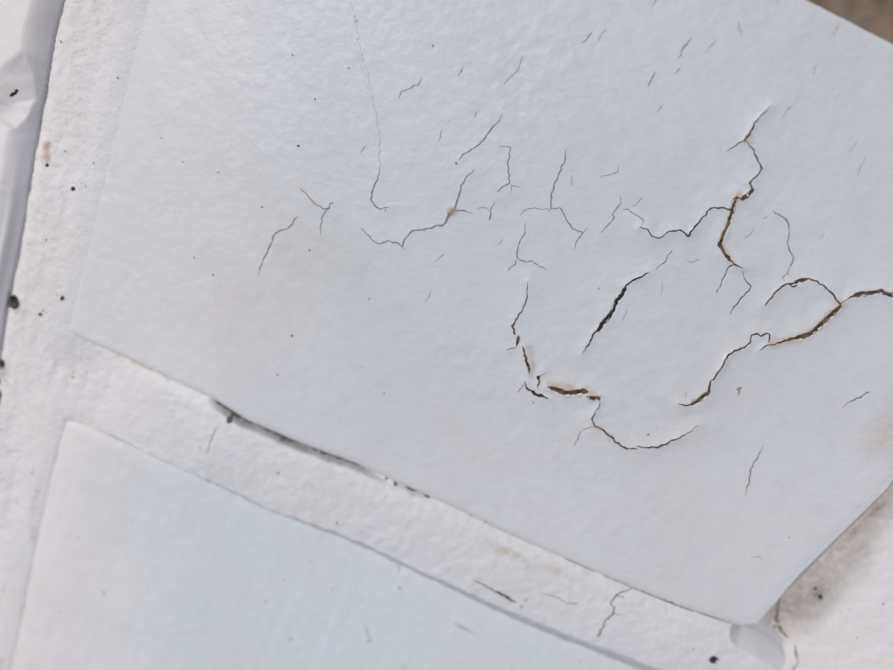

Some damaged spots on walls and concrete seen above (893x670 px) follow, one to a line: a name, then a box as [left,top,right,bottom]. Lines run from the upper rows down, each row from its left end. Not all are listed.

crack [258,217,297,275]
crack [300,188,334,234]
crack [360,111,517,250]
crack [498,106,893,449]
crack [566,559,729,637]